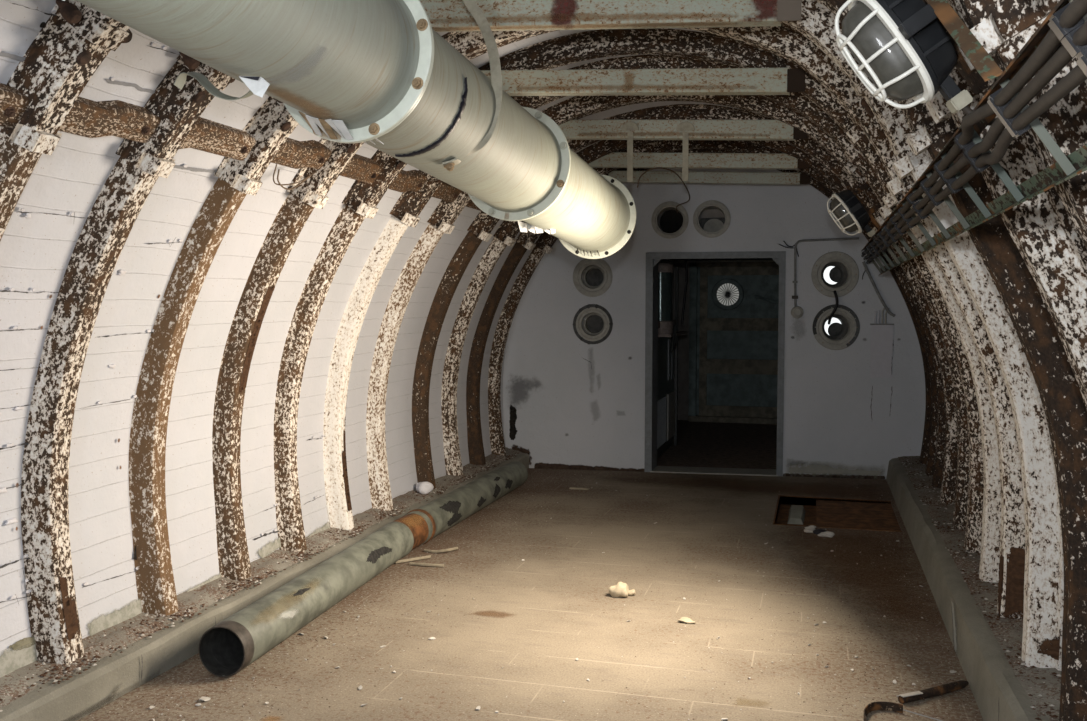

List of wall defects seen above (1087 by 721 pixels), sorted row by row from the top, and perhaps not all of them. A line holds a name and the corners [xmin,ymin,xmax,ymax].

rust [551,0,577,28]
rust [239,286,275,392]
rust [59,576,79,641]
rust [997,547,1025,619]
rust [1037,636,1060,666]